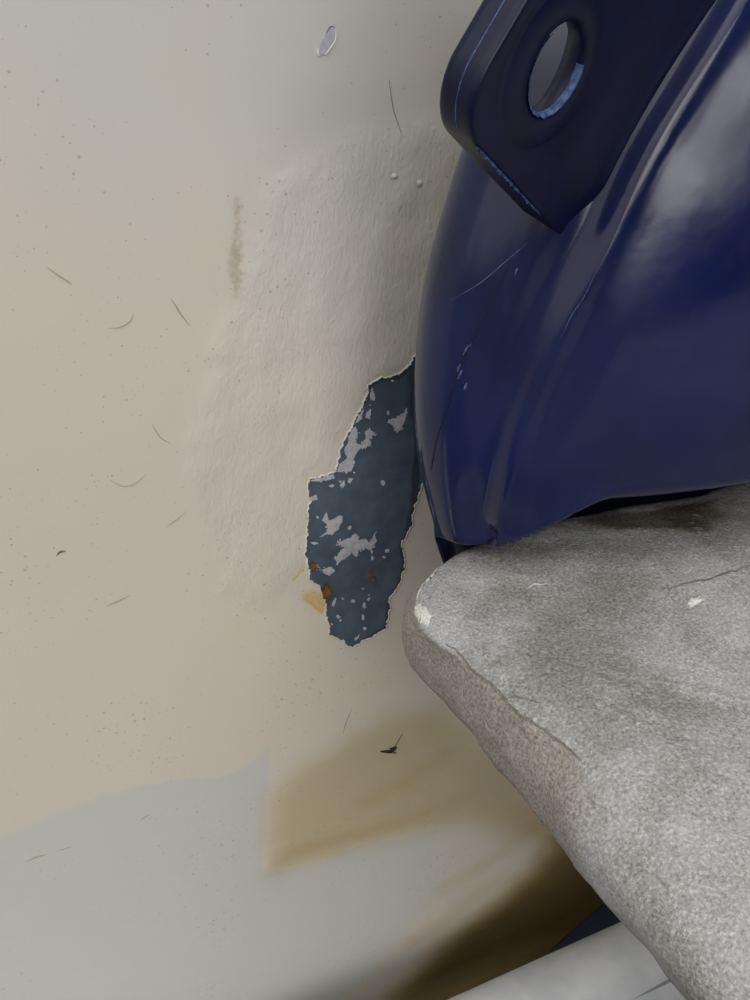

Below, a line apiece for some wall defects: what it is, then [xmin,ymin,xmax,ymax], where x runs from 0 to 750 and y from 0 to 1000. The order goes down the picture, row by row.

peeling [303,353,423,649]
corrosion [321,584,332,600]
damp [404,852,605,1000]